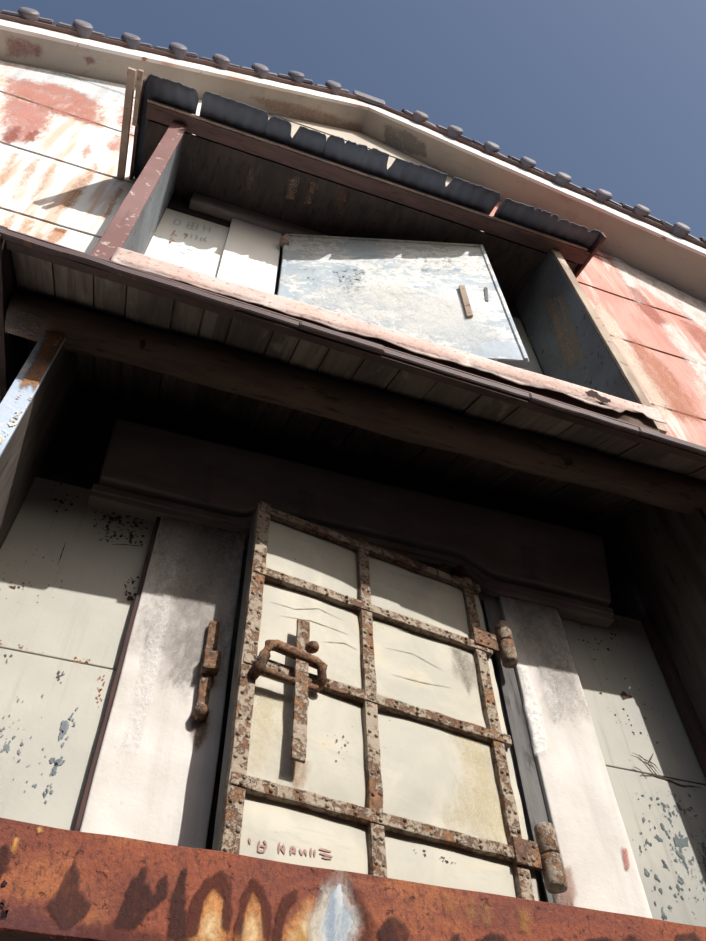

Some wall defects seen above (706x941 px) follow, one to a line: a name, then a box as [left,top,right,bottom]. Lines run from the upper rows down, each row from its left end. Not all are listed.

corrosion [0,79,102,182]
corrosion [59,146,98,208]
corrosion [629,287,664,323]
corrosion [593,298,700,421]
peeling [93,509,148,547]
peeling [0,707,78,803]
crack [633,753,697,787]
corrosion [0,870,316,941]
corrosion [377,916,407,941]
corrosion [557,868,575,906]
peeling [638,793,706,919]
corrosion [675,932,701,941]